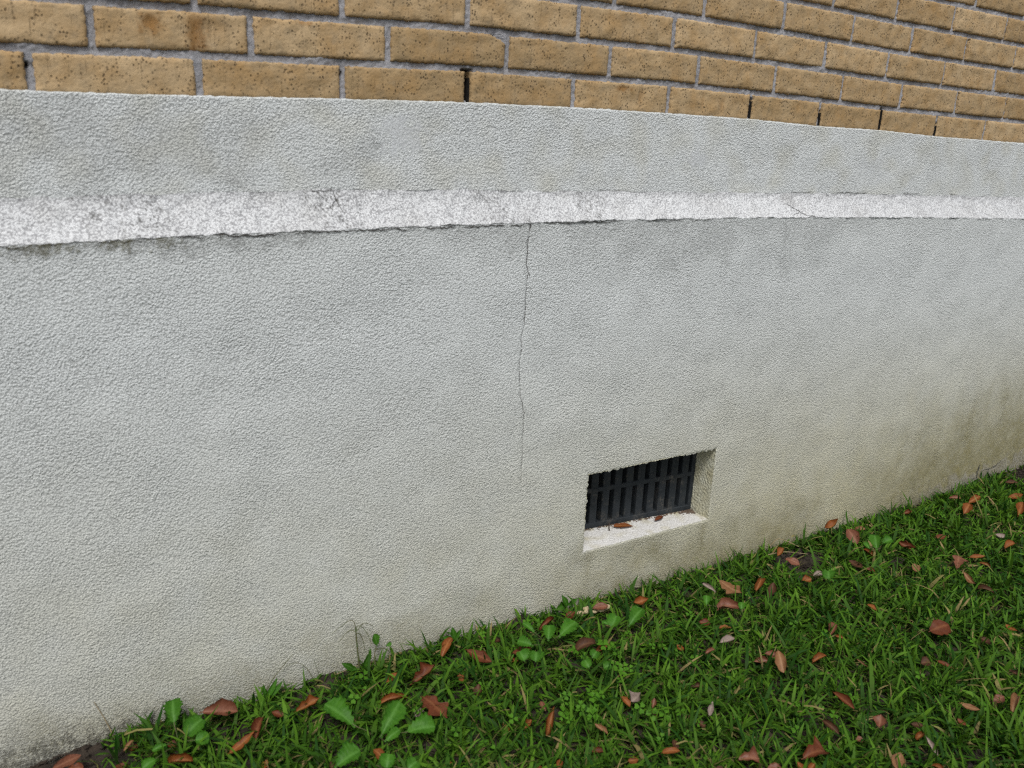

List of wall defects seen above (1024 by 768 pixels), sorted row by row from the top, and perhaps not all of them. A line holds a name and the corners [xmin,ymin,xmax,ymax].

crack [1,242,64,250]
crack [177,190,620,466]